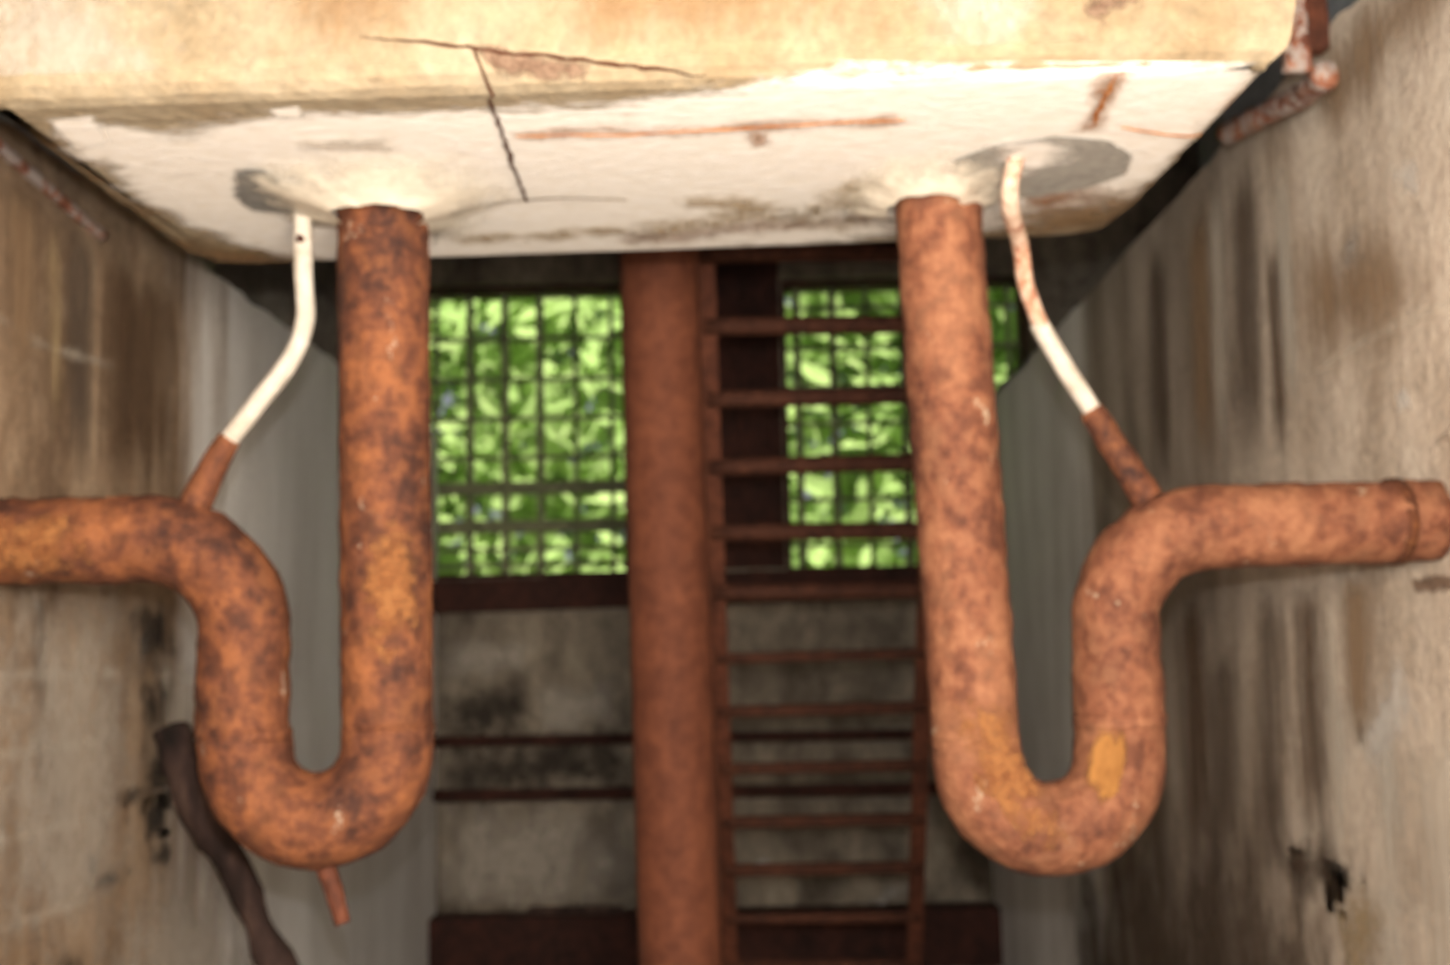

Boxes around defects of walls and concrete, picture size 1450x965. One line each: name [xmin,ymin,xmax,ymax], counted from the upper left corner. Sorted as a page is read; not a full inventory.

crack [362,37,905,210]
leakage [69,241,91,433]
leakage [113,273,165,474]
leakage [450,690,630,788]
leakage [1075,603,1328,965]
leakage [1299,586,1399,796]